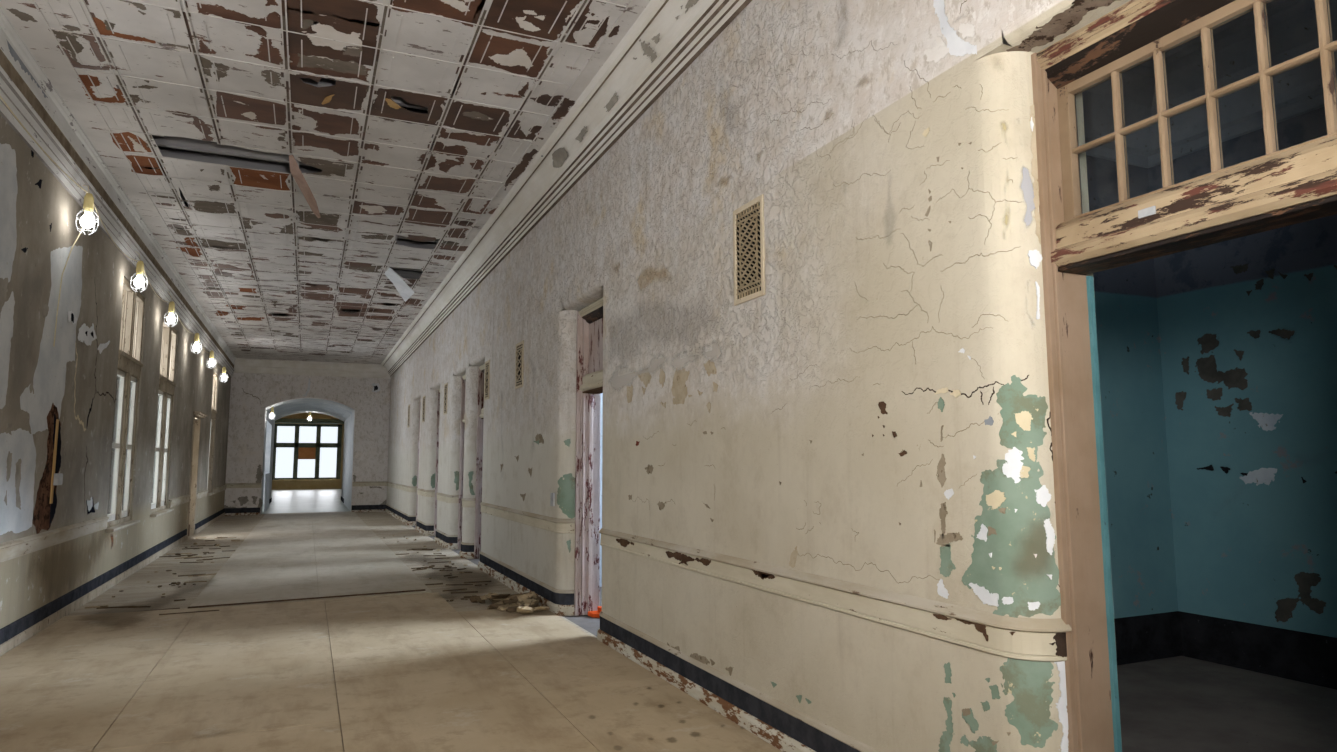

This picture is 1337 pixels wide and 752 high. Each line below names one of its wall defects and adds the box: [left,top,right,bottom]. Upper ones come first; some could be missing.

peeling [633,33,660,63]
peeling [1006,0,1120,52]
peeling [6,0,620,356]
crack [767,40,1029,485]
spalling [626,359,718,413]
peeling [1181,333,1283,431]
spalling [4,403,61,534]
peeling [557,473,575,519]
peeling [920,375,1061,641]
peeling [1197,465,1277,486]
spalling [1275,572,1326,622]
peeling [938,632,1069,752]